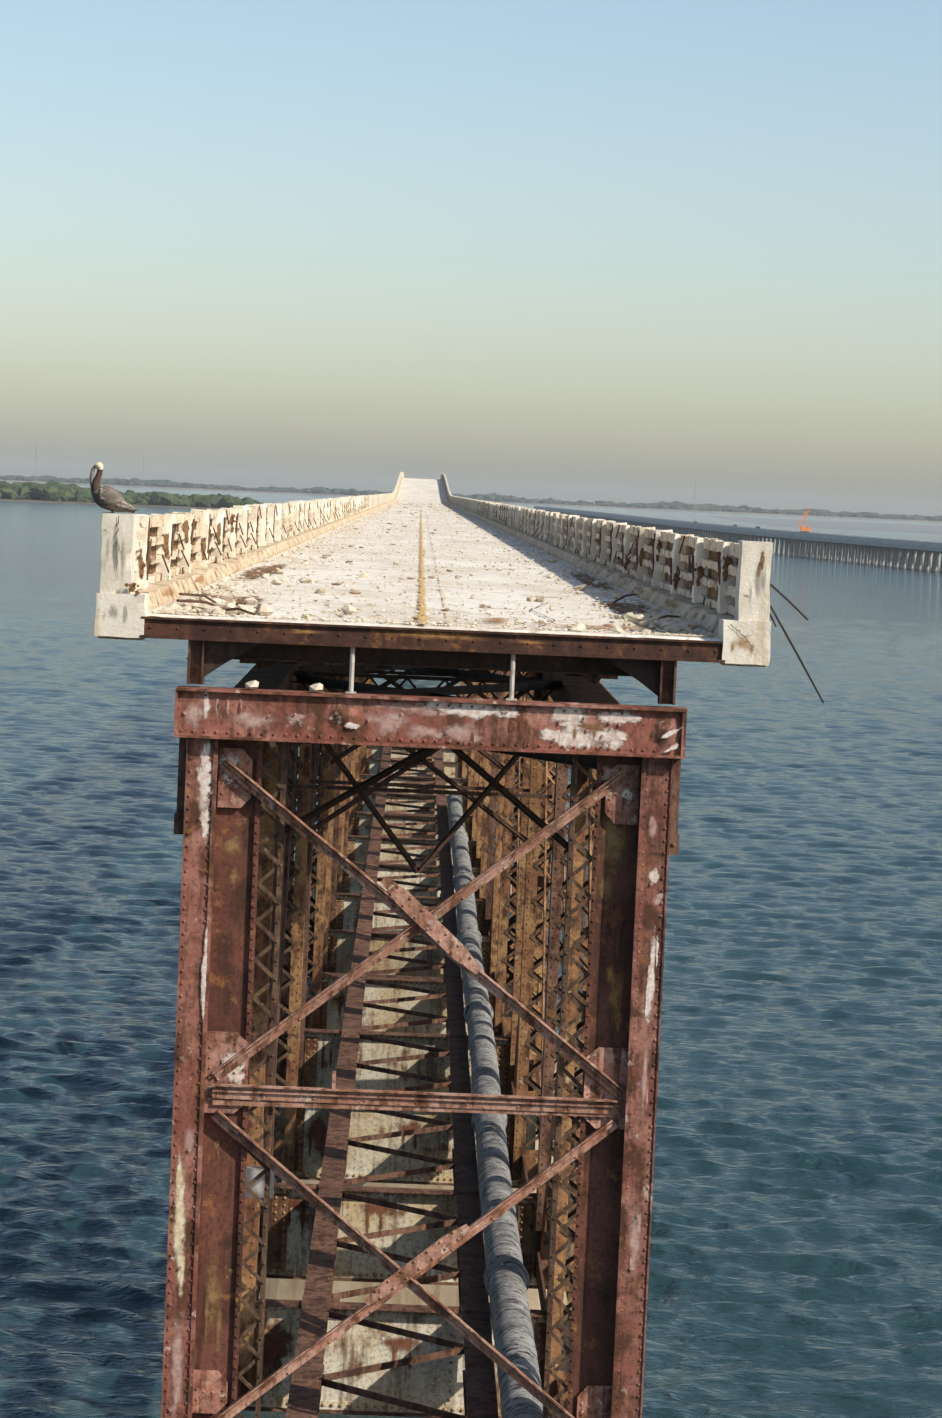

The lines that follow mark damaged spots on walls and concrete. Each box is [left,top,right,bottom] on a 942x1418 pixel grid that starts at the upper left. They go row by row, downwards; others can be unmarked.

rust [401,631,470,639]
rust [573,724,599,739]
peeling [541,703,642,751]
peeling [183,692,272,843]
rust [225,836,240,882]
rust [334,993,345,1017]
rust [306,1114,326,1156]
rust [287,1197,311,1232]
rust [364,1204,394,1232]
rust [205,1266,222,1351]
rust [264,1320,294,1374]
rust [382,1337,419,1371]